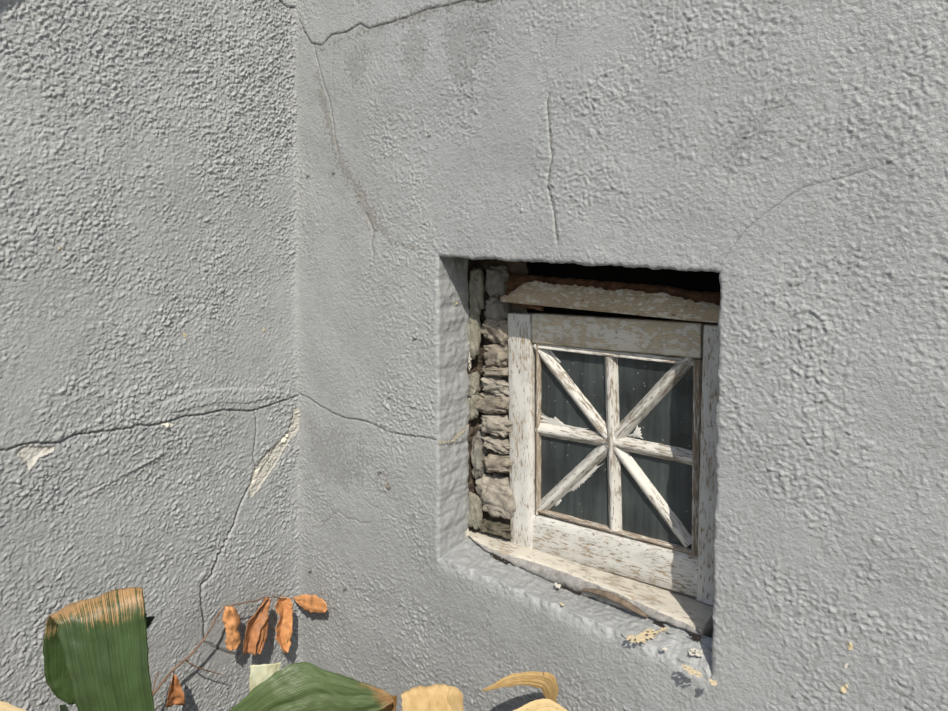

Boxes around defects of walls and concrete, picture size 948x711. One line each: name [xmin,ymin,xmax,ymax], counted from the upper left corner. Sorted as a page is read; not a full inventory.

crack [280,0,493,148]
crack [547,97,561,255]
spalling [16,444,54,470]
spalling [248,406,301,497]
crack [1,394,469,655]
spalling [465,492,483,538]
peeling [627,627,670,643]
peeling [682,648,717,686]